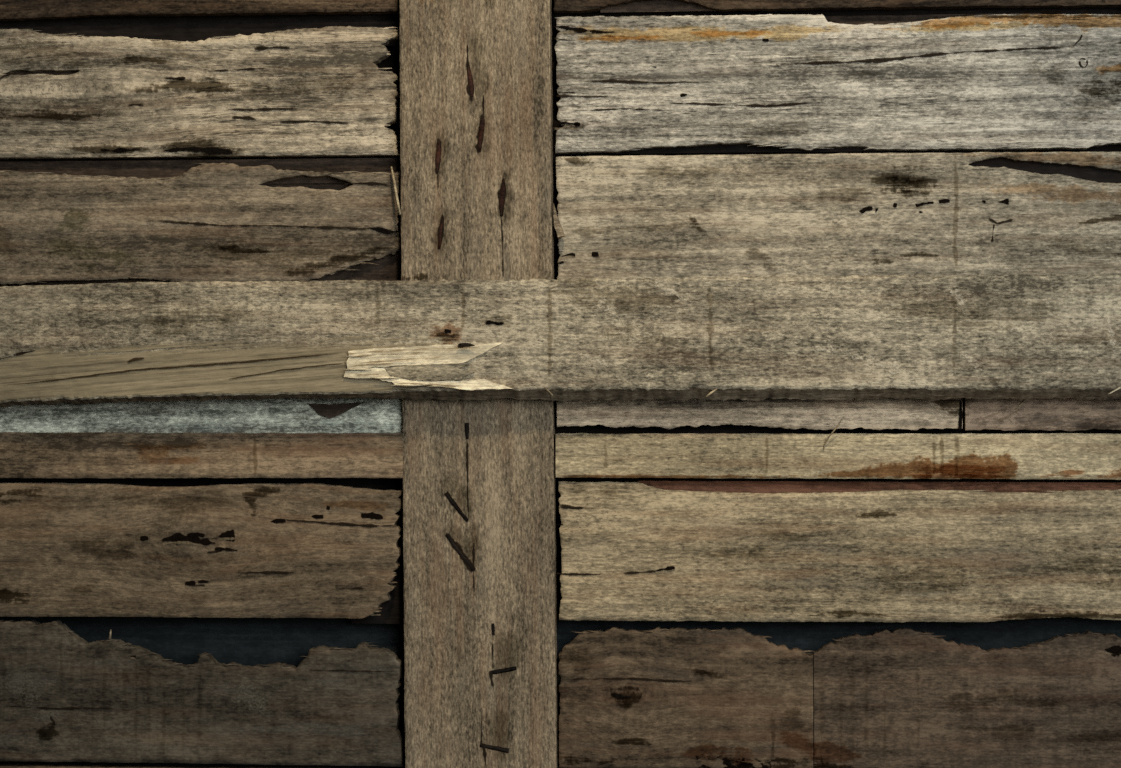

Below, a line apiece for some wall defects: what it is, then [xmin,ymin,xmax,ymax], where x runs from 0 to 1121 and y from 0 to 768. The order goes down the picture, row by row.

corrosion [466,44,484,153]
corrosion [498,180,507,275]
spalling [0,336,440,418]
corrosion [446,533,475,589]
spalling [1105,645,1121,657]